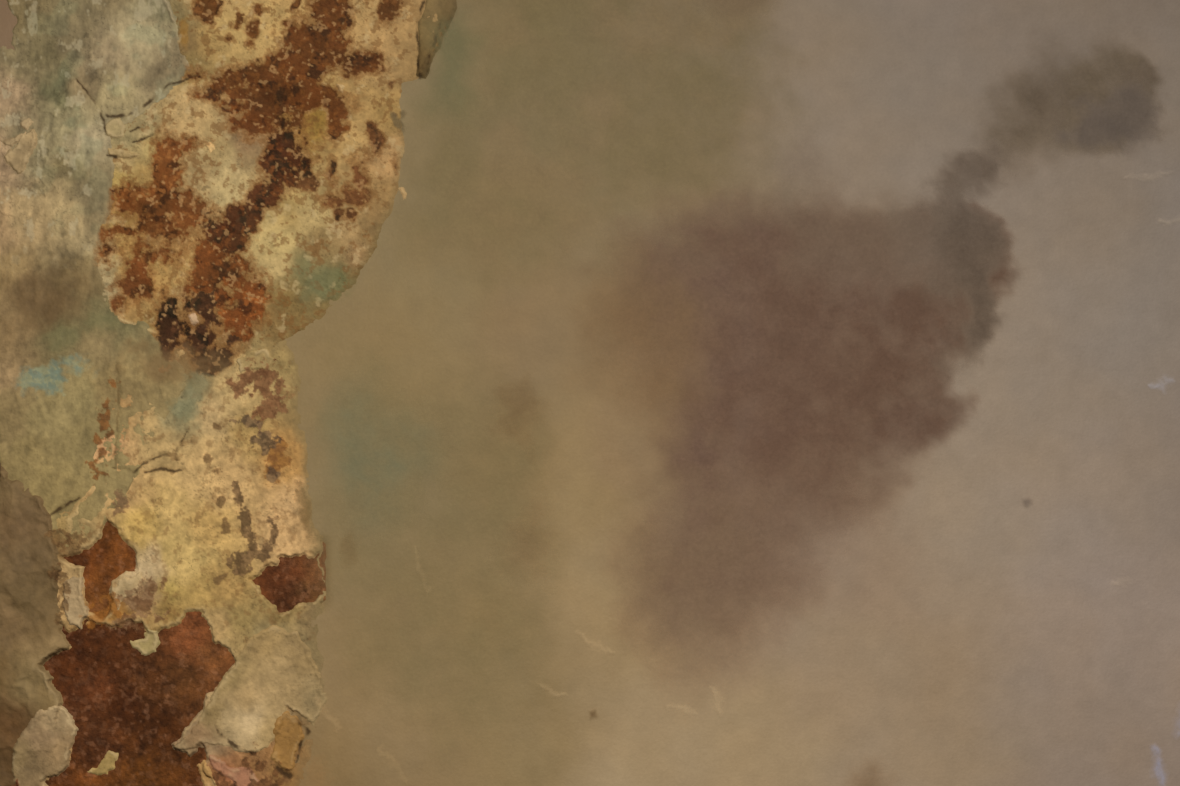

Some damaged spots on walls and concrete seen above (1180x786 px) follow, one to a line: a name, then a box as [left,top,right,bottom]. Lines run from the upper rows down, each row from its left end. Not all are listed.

corrosion [94,0,403,483]
corrosion [85,379,121,480]
peeling [0,0,457,786]
water stain [622,47,1159,642]
corrosion [113,489,129,516]
corrosion [216,496,231,534]
corrosion [296,482,311,525]